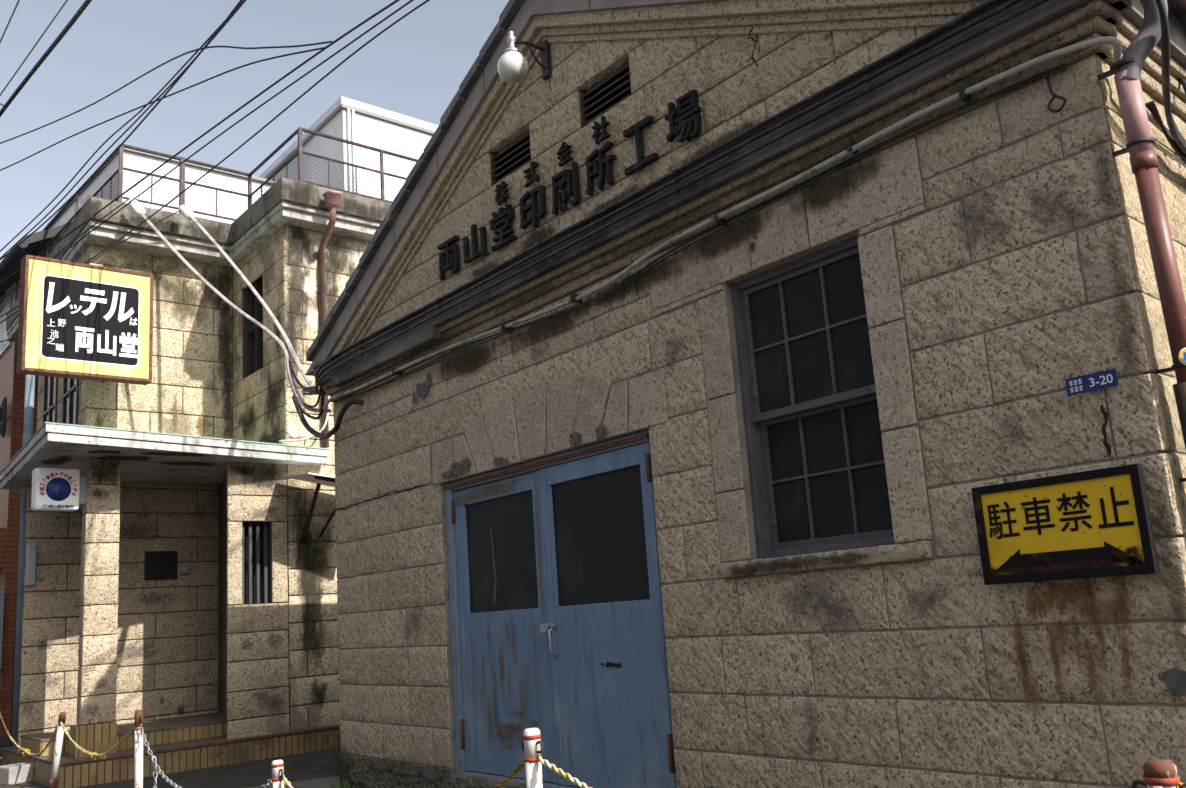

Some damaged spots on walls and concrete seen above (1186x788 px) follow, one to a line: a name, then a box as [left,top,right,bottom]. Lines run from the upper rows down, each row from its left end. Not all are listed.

water stain [133,215,225,244]
water stain [202,266,319,444]
water stain [274,228,364,374]
water stain [238,464,277,487]
crack [1100,404,1111,457]
water stain [293,496,322,649]
water stain [313,681,327,704]
rust [471,621,538,748]
rust [1013,576,1131,712]